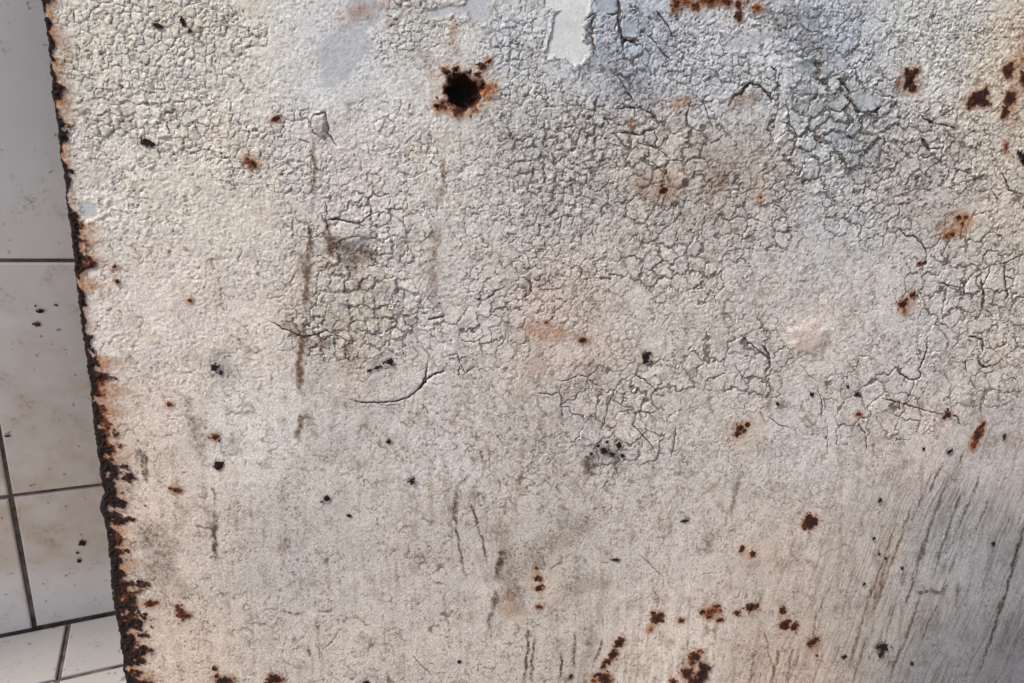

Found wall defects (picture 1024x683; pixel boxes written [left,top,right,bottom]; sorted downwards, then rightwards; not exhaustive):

rust [670,0,763,22]
rust [434,59,495,118]
crack [585,0,684,220]
crack [685,59,886,153]
rust [965,60,1024,121]
peeling [376,0,1004,358]
rust [41,0,159,683]
crack [350,354,474,406]
crack [538,373,676,457]
crack [900,229,1024,389]
rust [591,633,625,683]
rust [669,649,712,683]